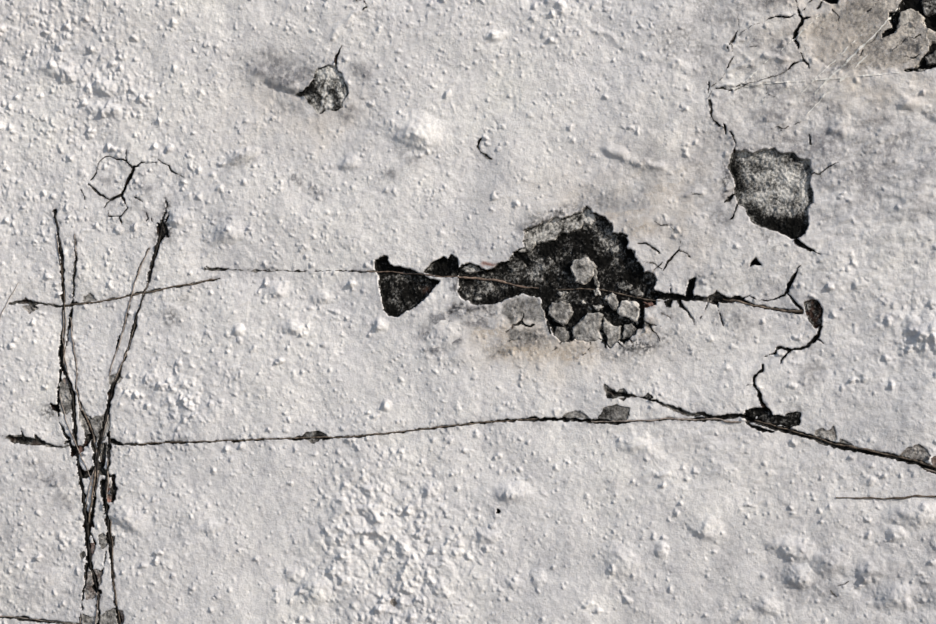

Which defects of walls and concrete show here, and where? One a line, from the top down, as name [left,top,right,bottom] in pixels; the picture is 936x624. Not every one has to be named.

flaking render [295,64,349,114]
crack [708,0,839,153]
peeling [816,0,936,72]
crack [860,0,921,59]
crack [477,138,493,160]
flaking render [727,148,813,239]
flaking render [374,206,660,348]
crack [0,149,936,624]